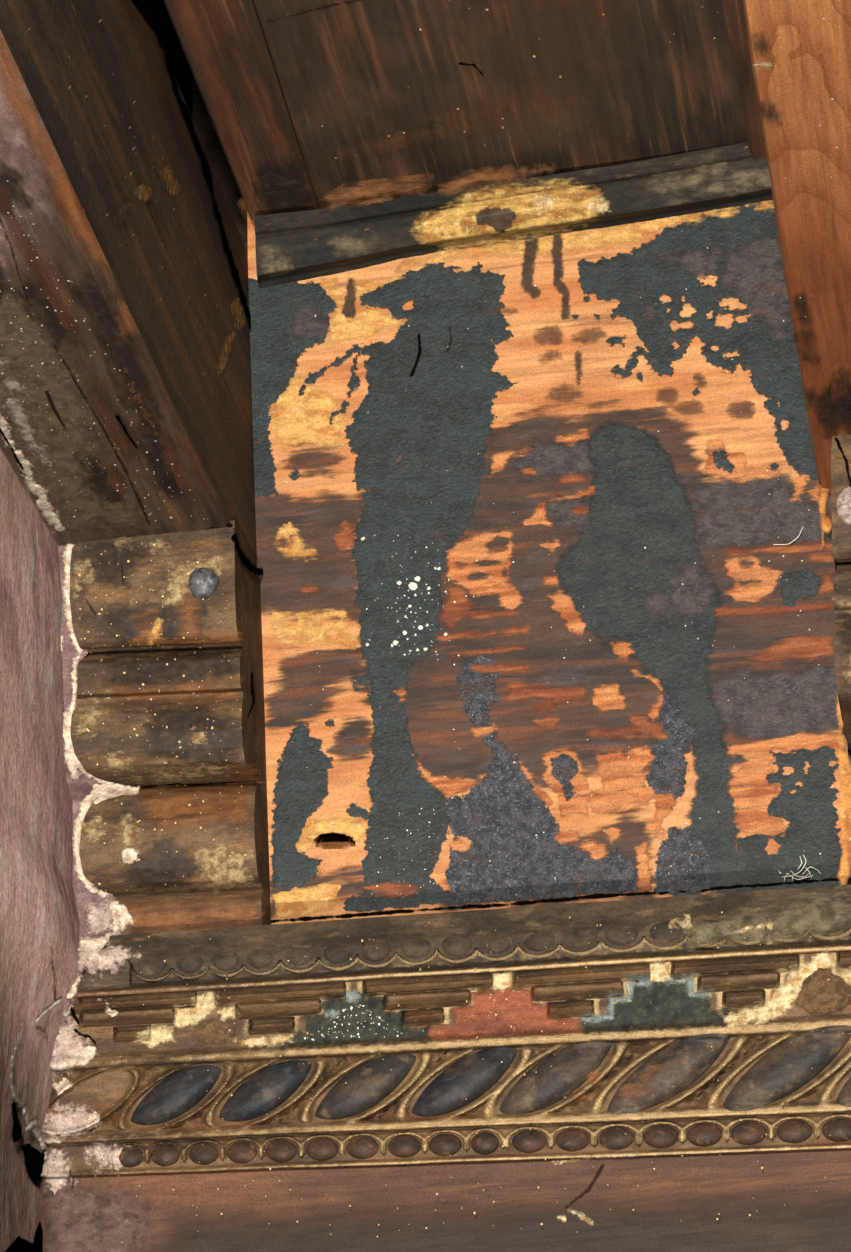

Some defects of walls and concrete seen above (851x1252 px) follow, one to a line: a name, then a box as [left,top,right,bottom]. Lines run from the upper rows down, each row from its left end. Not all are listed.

crack [0,219,31,306]
water stain [0,30,375,1252]
peeling [248,200,843,912]
water stain [402,234,851,795]
water stain [564,809,656,899]
spalling [9,998,63,1182]
spalling [5,1221,43,1252]